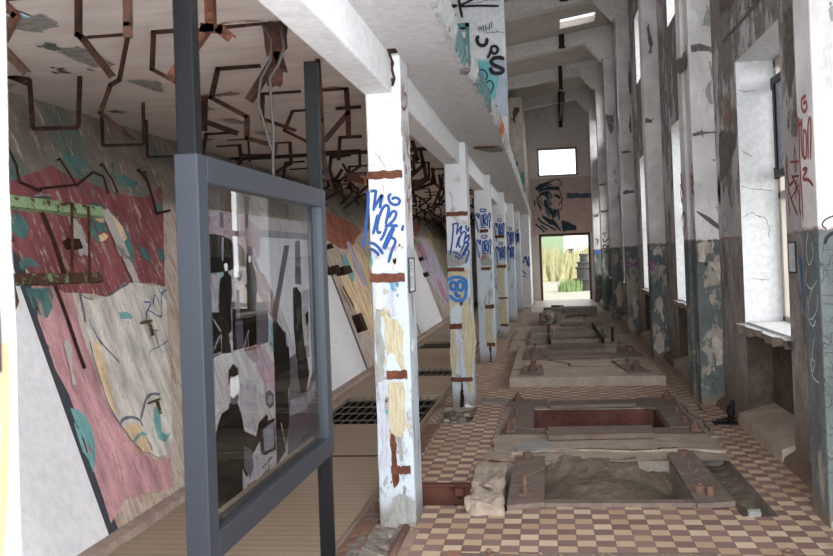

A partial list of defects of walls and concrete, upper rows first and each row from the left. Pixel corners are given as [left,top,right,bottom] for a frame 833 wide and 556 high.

spalling [5,9,116,71]
spalling [672,44,713,104]
peeling [693,128,736,212]
peeling [372,235,405,274]
peeling [697,240,721,281]
peeling [447,250,508,407]
peeling [654,296,667,354]
peeling [712,336,723,371]
peeling [374,282,417,527]